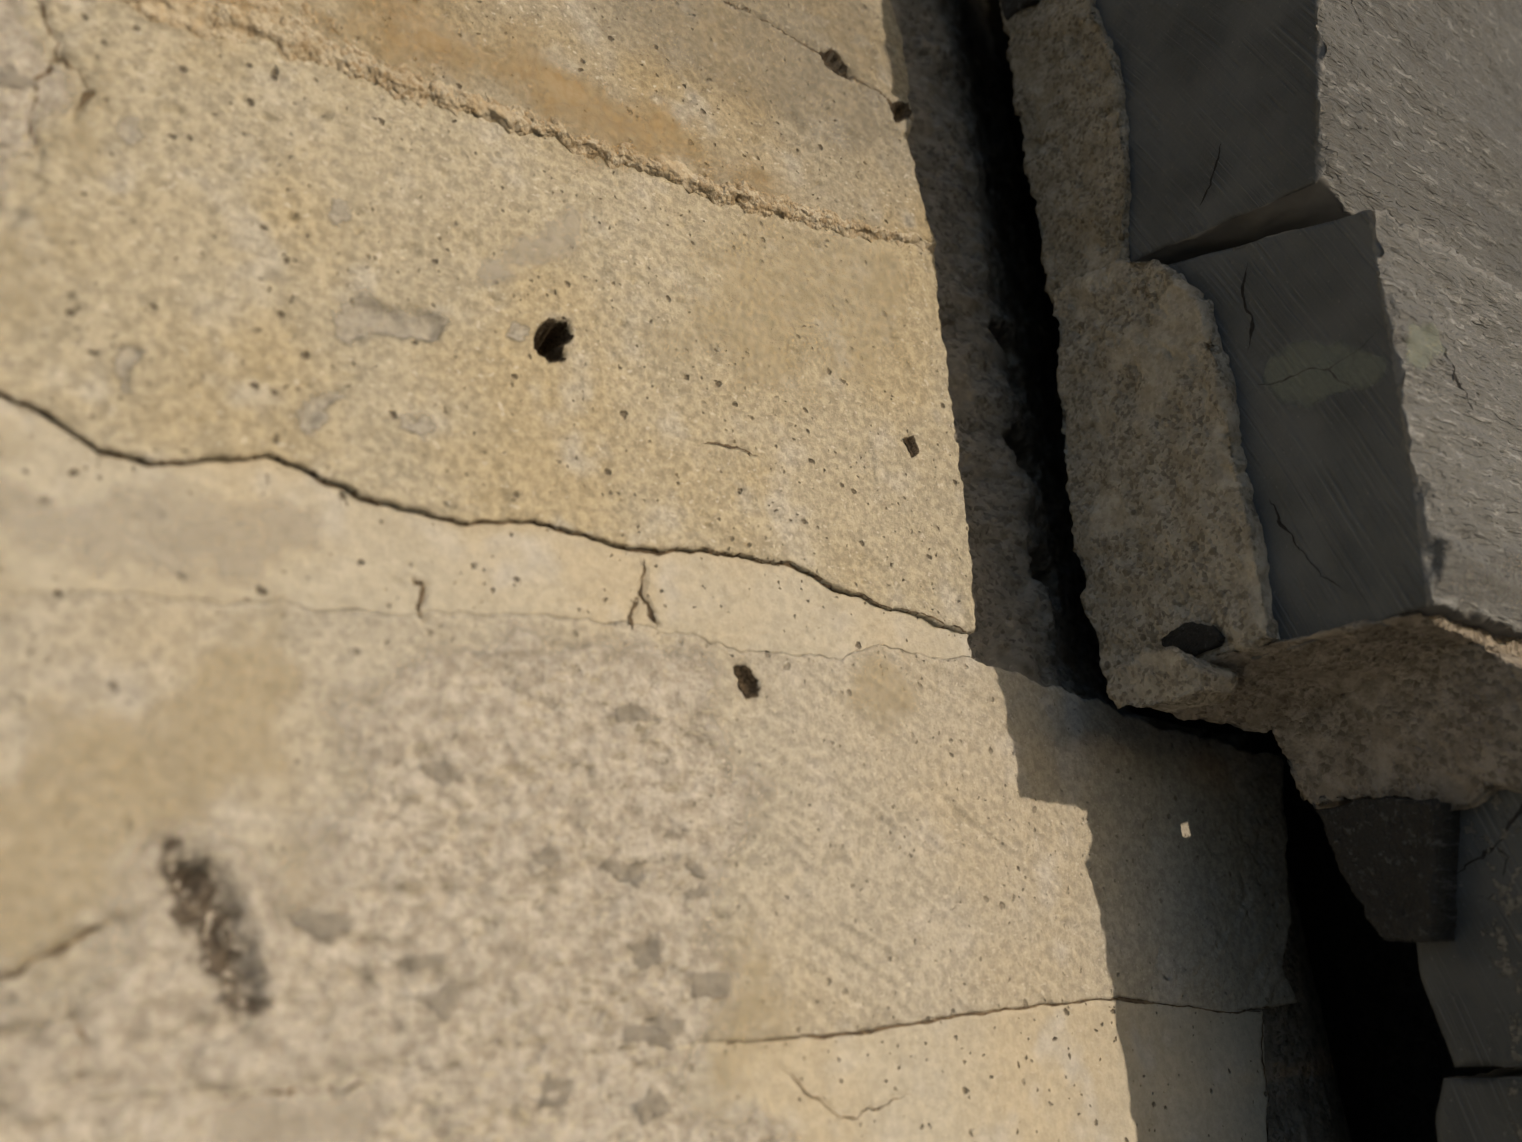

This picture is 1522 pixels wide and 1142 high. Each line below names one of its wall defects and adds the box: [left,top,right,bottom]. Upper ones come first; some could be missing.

crack [29,0,95,153]
crack [722,0,818,54]
crack [849,76,913,121]
crack [0,392,966,634]
crack [0,919,116,979]
spalling [0,628,784,1142]
crack [725,996,1269,1139]